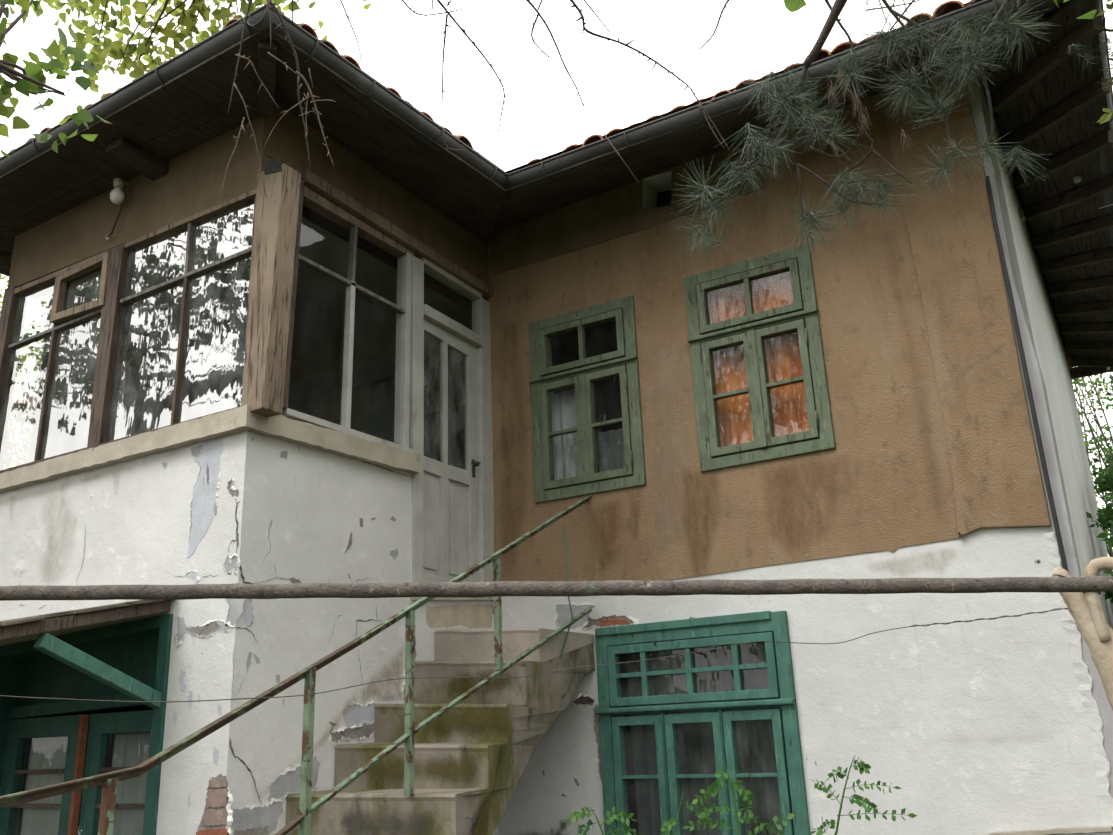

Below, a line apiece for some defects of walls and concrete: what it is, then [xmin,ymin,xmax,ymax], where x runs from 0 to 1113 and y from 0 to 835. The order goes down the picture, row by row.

peeling [185,437,242,584]
crack [175,499,301,584]
spalling [174,599,254,655]
crack [231,621,258,699]
crack [330,609,382,693]
spalling [554,602,639,632]
peeling [328,700,377,747]
crack [229,737,262,803]
flaking render [196,745,320,835]